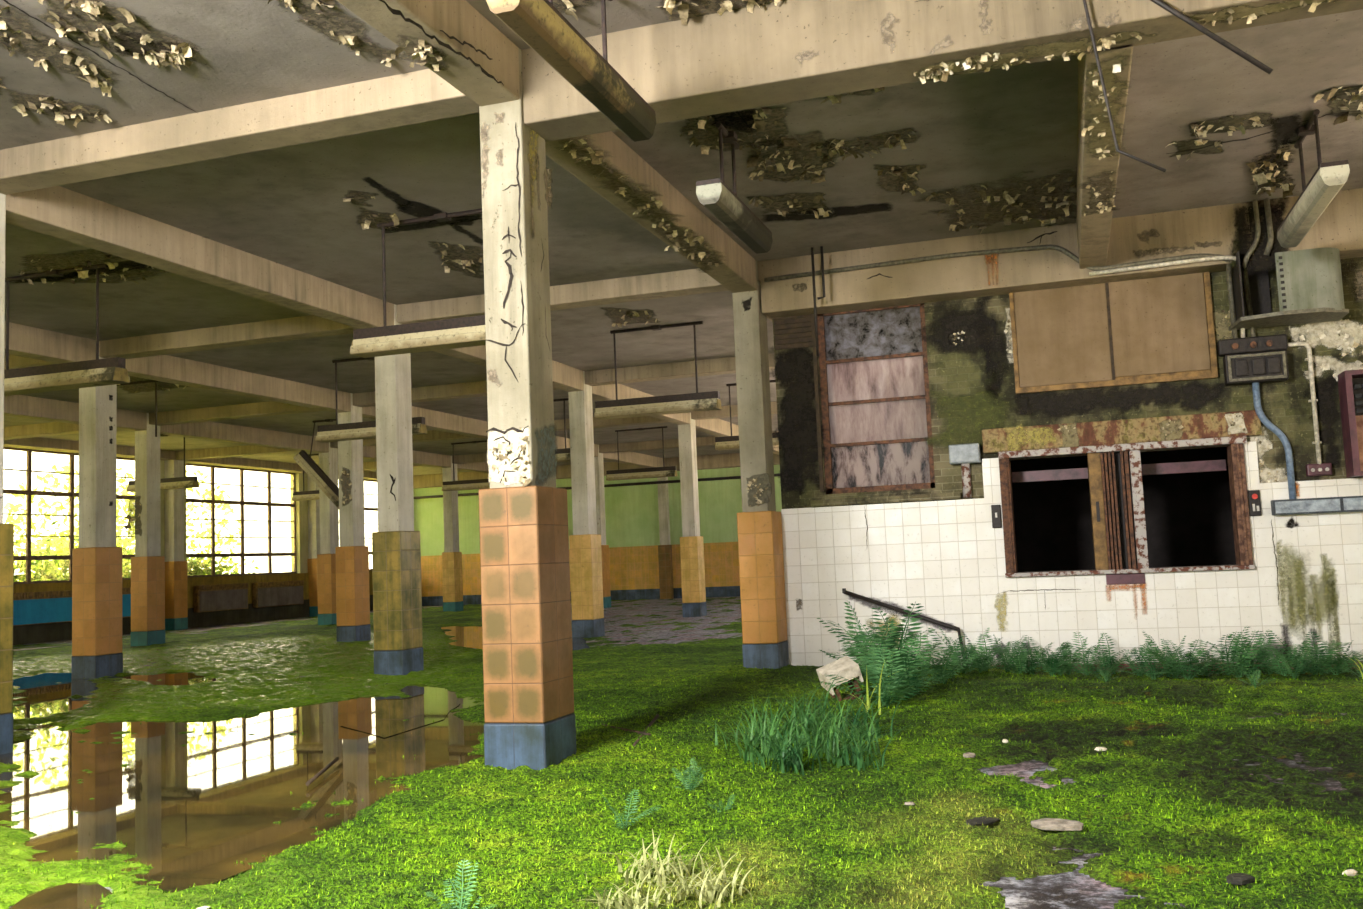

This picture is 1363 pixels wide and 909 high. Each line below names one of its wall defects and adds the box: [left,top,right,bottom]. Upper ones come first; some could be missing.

peeling [657,0,785,25]
peeling [0,0,197,128]
peeling [680,14,1156,234]
peeling [1165,112,1273,161]
crack [486,123,550,381]
peeling [561,139,723,273]
damp [922,296,1007,397]
damp [1015,380,1225,420]
peeling [1289,320,1363,381]
peeling [487,427,531,486]
rust [1106,584,1147,611]
damp [1249,543,1340,661]